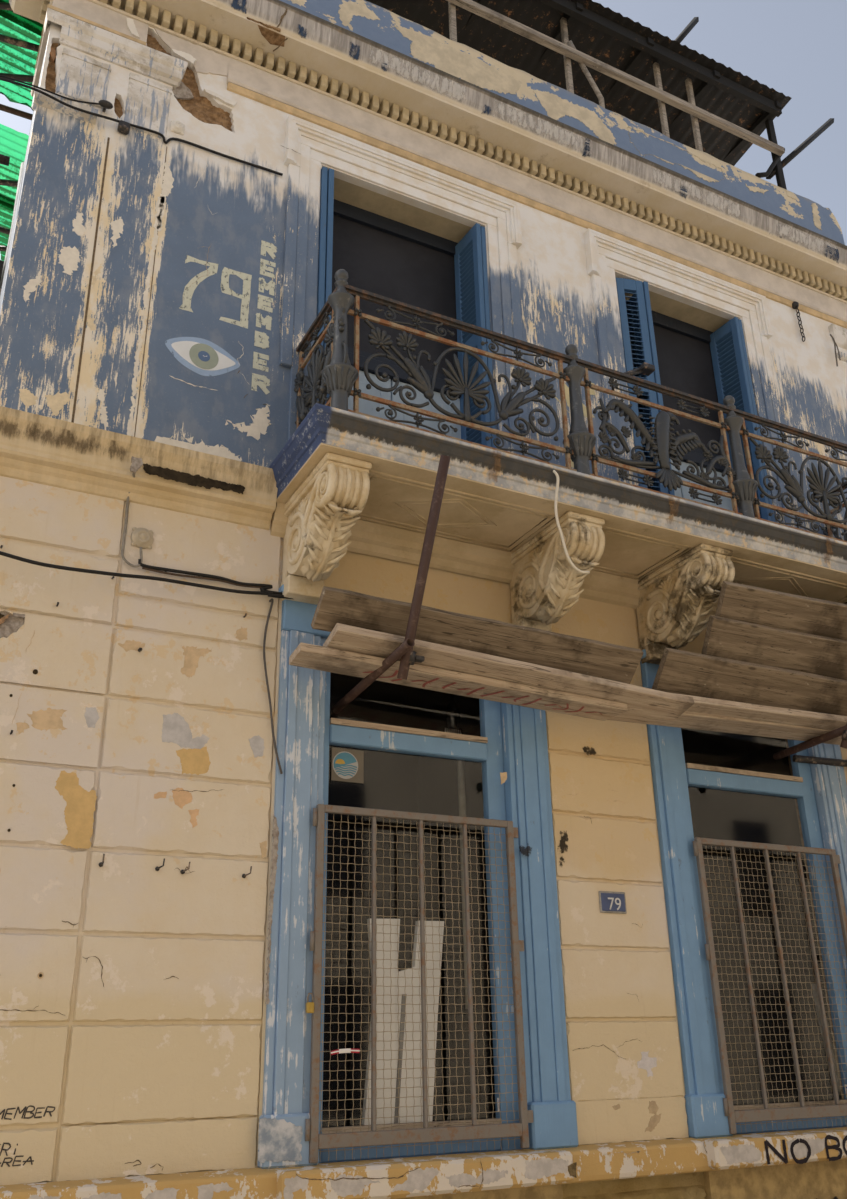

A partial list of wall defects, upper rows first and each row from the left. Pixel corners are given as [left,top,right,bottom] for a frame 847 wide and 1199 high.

peeling [338,1,380,31]
spalling [126,18,237,131]
peeling [394,26,725,182]
peeling [811,203,822,230]
peeling [225,404,271,440]
spalling [0,611,25,638]
peeling [16,708,67,734]
peeling [154,713,211,828]
peeling [55,771,97,849]
peeling [197,1182,233,1199]
peeling [330,1167,508,1197]
peeling [525,1158,577,1180]